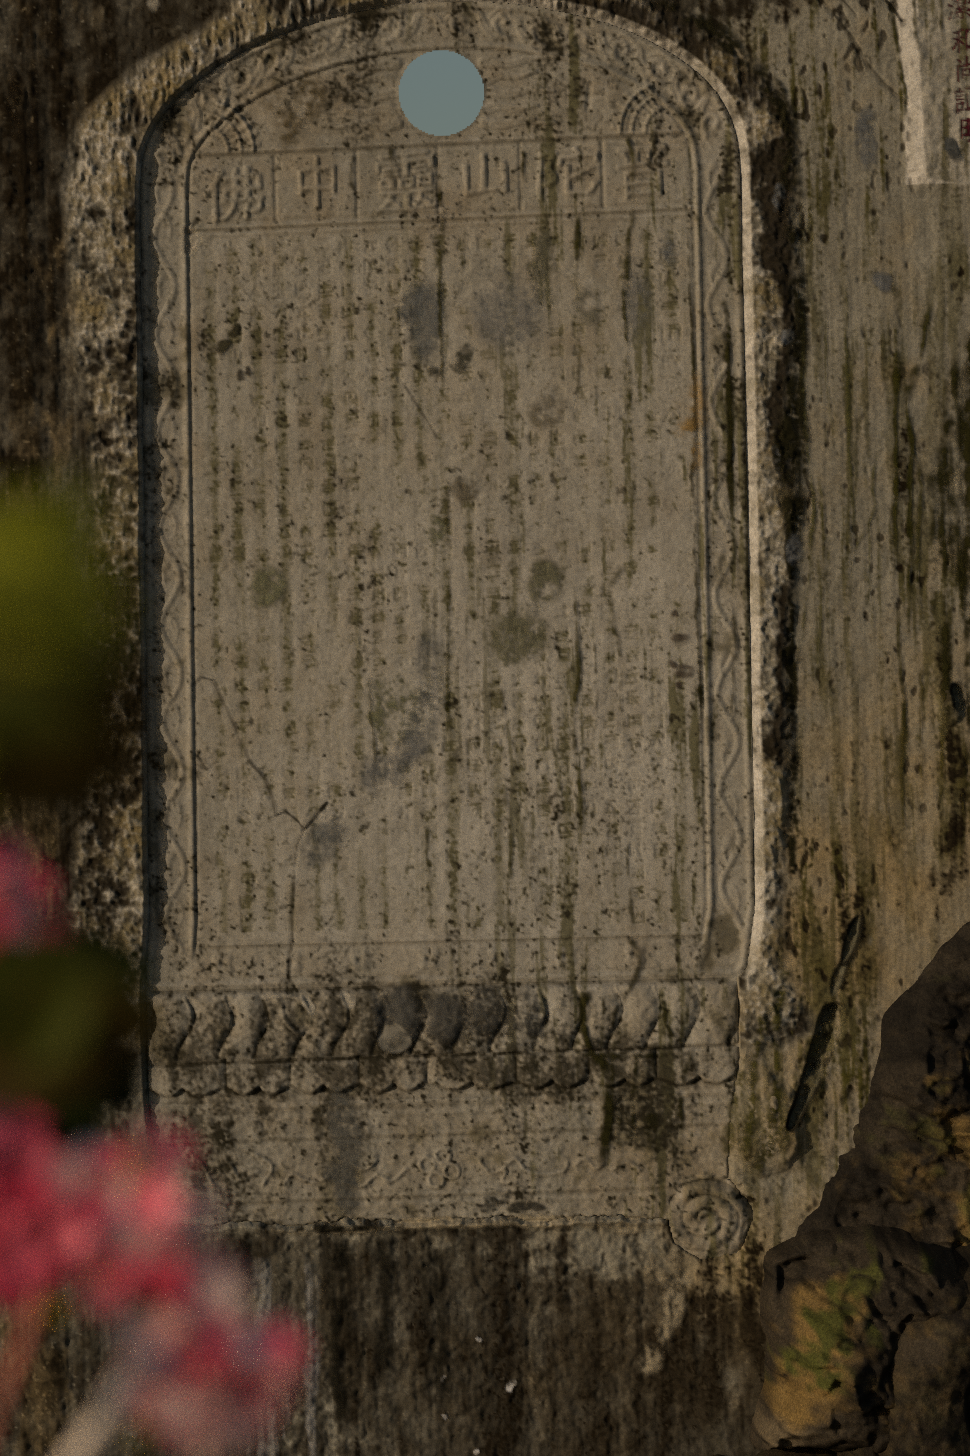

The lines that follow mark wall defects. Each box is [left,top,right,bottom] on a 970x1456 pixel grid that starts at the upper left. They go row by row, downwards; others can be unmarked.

crack [885,0,902,22]
leakage [892,0,917,110]
leakage [688,285,696,492]
leakage [723,302,733,507]
leakage [764,227,875,874]
leakage [892,311,970,725]
leakage [882,667,923,846]
leakage [297,1225,397,1455]